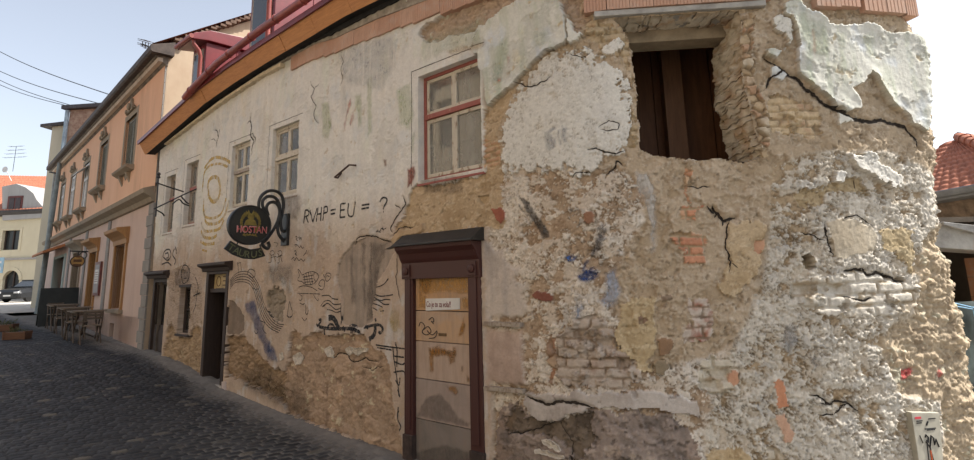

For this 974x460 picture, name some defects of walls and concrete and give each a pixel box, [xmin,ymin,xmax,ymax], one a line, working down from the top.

peeling [395,0,633,234]
spalling [740,12,823,149]
crack [764,59,919,150]
peeling [768,0,933,130]
spalling [225,235,402,454]
spalling [532,290,554,302]
spalling [492,294,752,460]
crack [688,186,738,271]
crack [811,395,858,416]
spalling [793,151,904,208]
crack [801,215,902,301]
spalling [788,217,921,320]